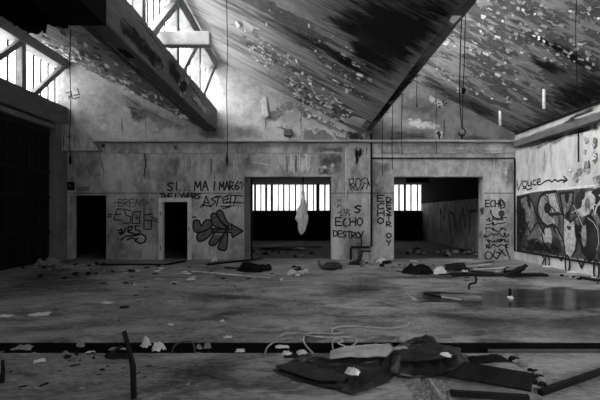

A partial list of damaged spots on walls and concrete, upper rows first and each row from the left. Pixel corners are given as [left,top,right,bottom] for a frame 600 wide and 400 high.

peeling [25,26,202,125]
damp [120,21,180,83]
peeling [230,0,385,140]
peeling [427,0,600,104]
flaking render [569,136,600,186]